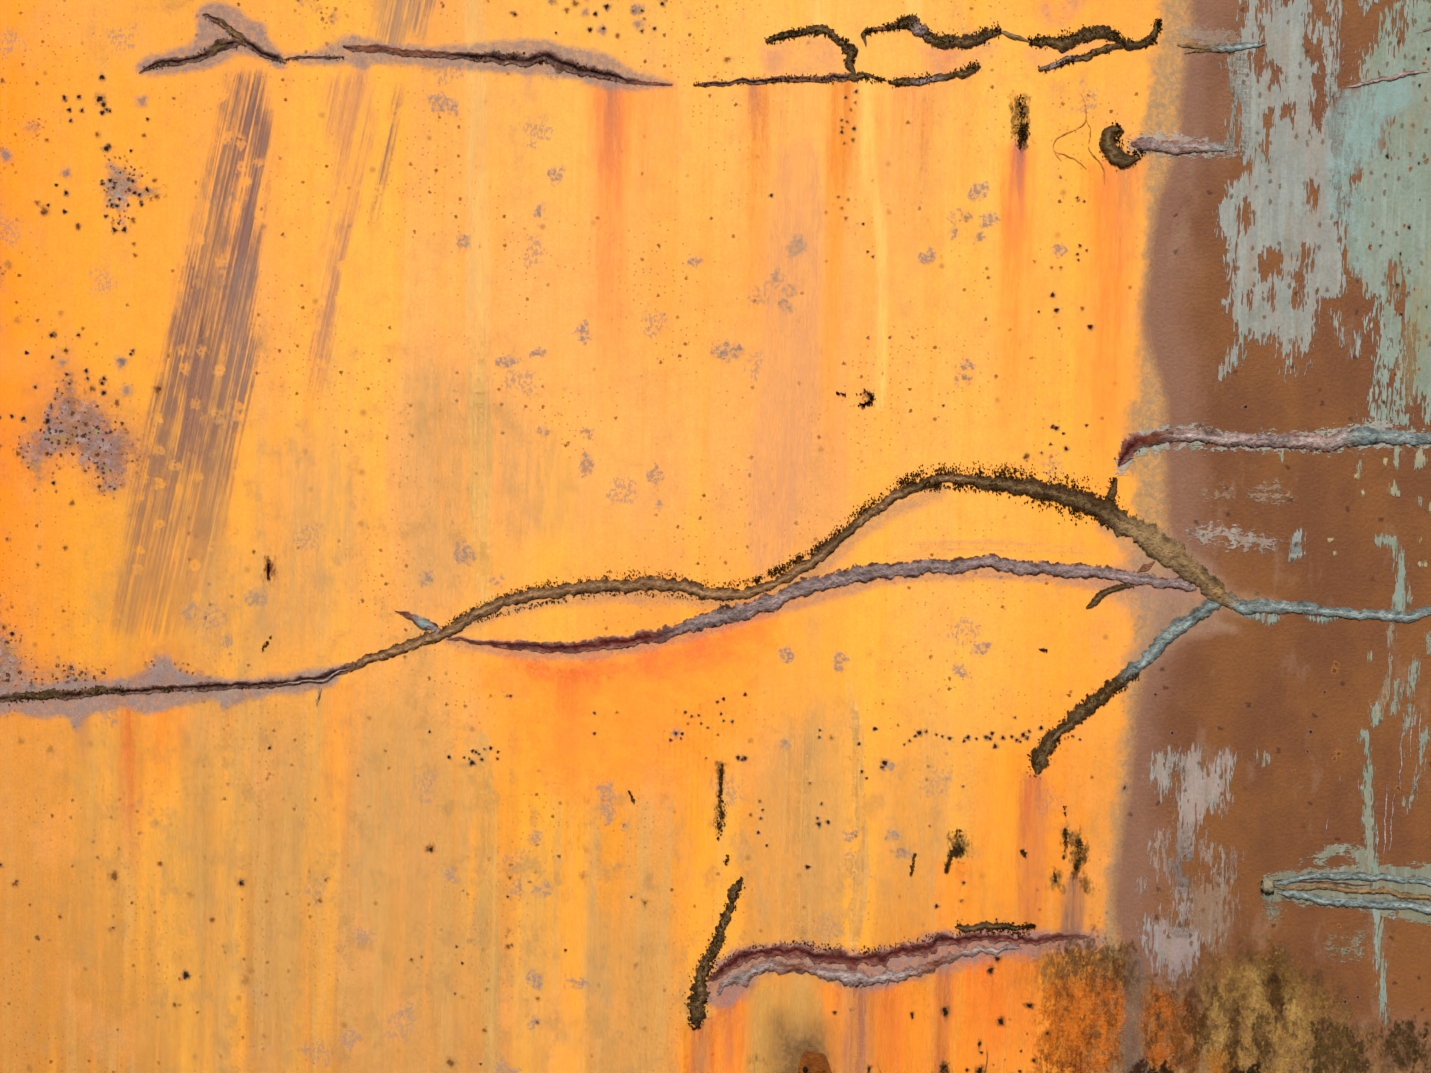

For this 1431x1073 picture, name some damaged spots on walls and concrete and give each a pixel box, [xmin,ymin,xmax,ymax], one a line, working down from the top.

crack [136,0,1265,183]
spalling [34,169,81,230]
spalling [49,310,135,407]
peeling [1383,445,1428,497]
crack [0,418,1431,778]
crack [1260,844,1431,927]
crack [682,877,1104,1030]